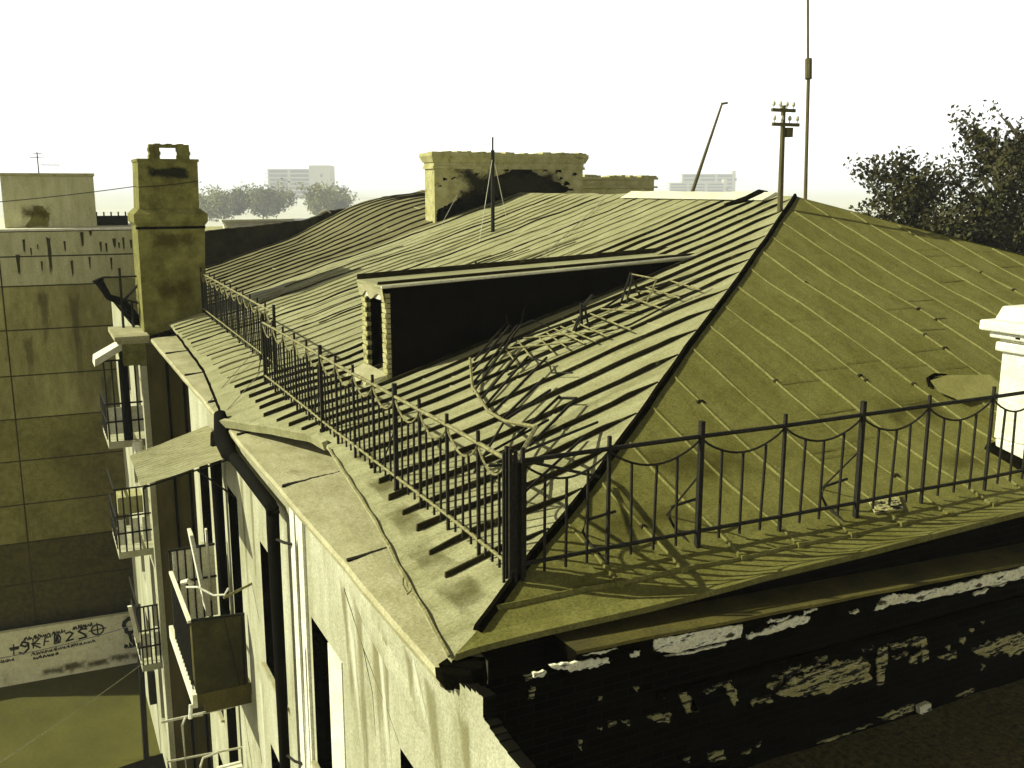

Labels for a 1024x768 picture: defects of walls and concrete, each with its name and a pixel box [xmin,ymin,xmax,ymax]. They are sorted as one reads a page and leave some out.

damp [16,205,74,275]
damp [80,231,132,270]
flaking render [873,566,1024,611]
flaking render [653,608,817,657]
flaking render [523,648,617,699]
flaking render [679,621,1024,713]
flaking render [597,719,630,730]
flaking render [647,712,672,723]
flaking render [817,701,932,744]
flaking render [707,749,726,762]